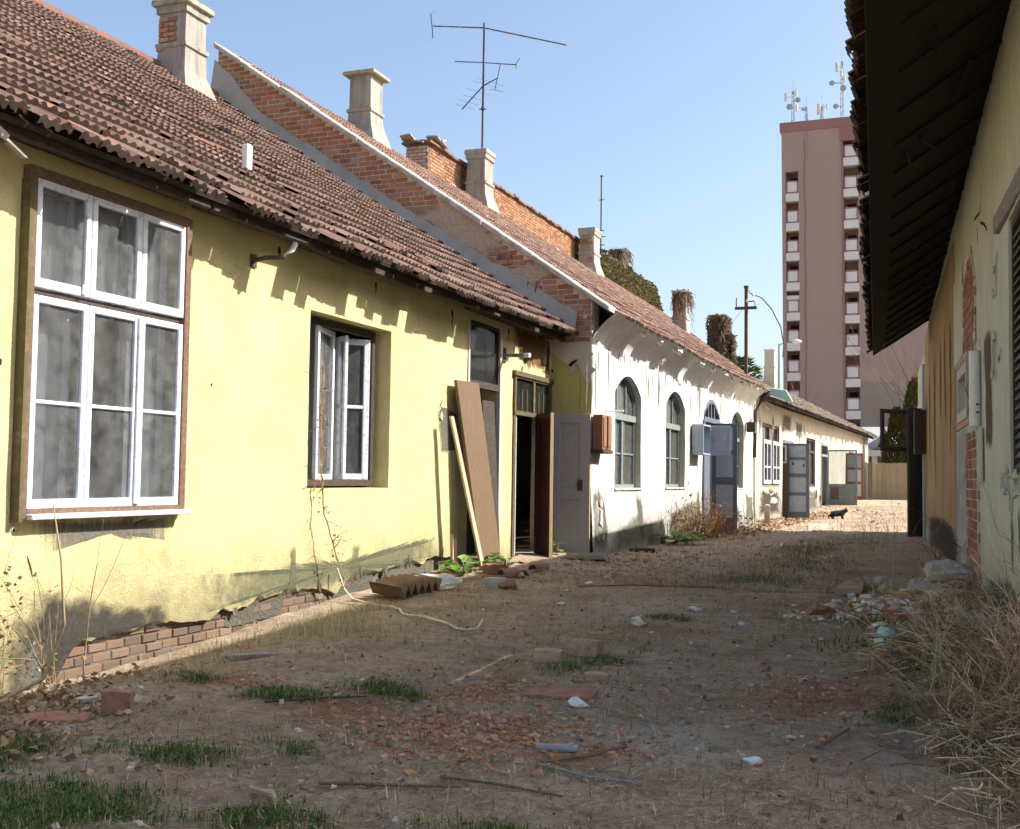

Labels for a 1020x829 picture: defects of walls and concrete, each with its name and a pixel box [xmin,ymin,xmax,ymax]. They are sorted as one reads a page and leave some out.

spalling [961,245,977,368]
damp [586,350,625,408]
damp [646,369,681,405]
peeling [990,329,1002,381]
damp [618,495,654,547]
damp [673,492,700,531]
damp [16,596,165,691]
spalling [51,554,450,680]